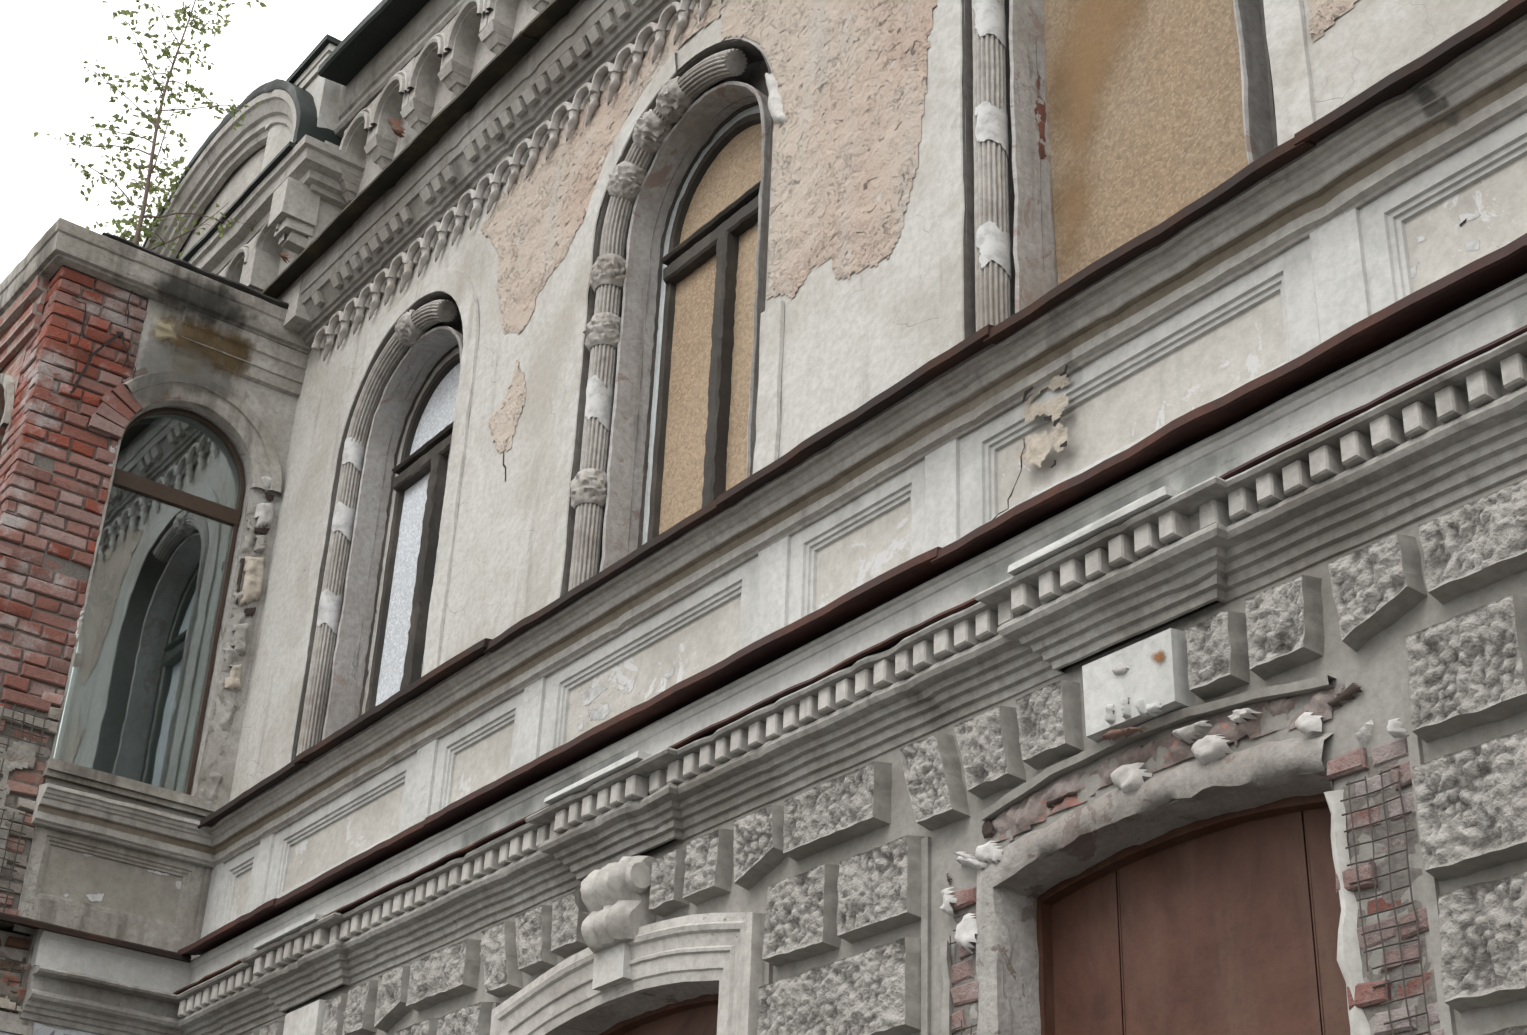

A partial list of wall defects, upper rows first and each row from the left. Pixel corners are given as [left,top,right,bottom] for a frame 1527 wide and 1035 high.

flaking render [1307,0,1358,42]
flaking render [481,0,938,335]
damp [133,276,255,400]
flaking render [488,359,526,454]
flaking render [1020,365,1071,467]
peeling [0,737,37,875]
spalling [0,930,31,1013]